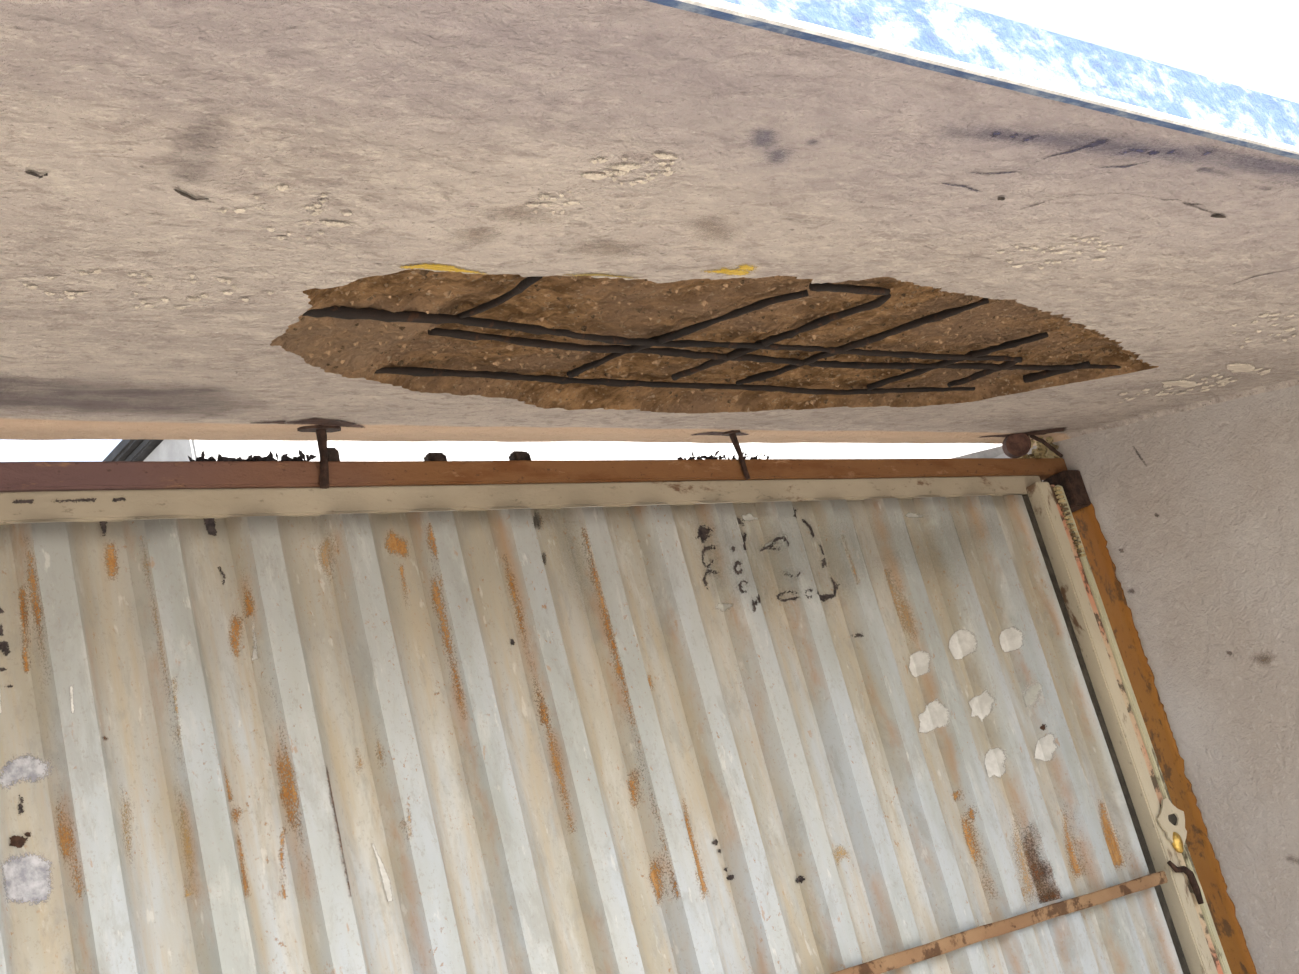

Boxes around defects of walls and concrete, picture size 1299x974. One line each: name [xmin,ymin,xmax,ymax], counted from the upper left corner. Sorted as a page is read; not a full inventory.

spalling [270,269,1299,414]
rust [18,551,42,672]
rust [229,588,254,657]
rust [384,530,409,597]
rust [431,576,465,714]
rust [582,528,640,738]
rust [629,770,657,813]
rust [56,801,85,898]
rust [649,838,678,904]
rust [682,801,707,900]
rust [1015,826,1062,904]